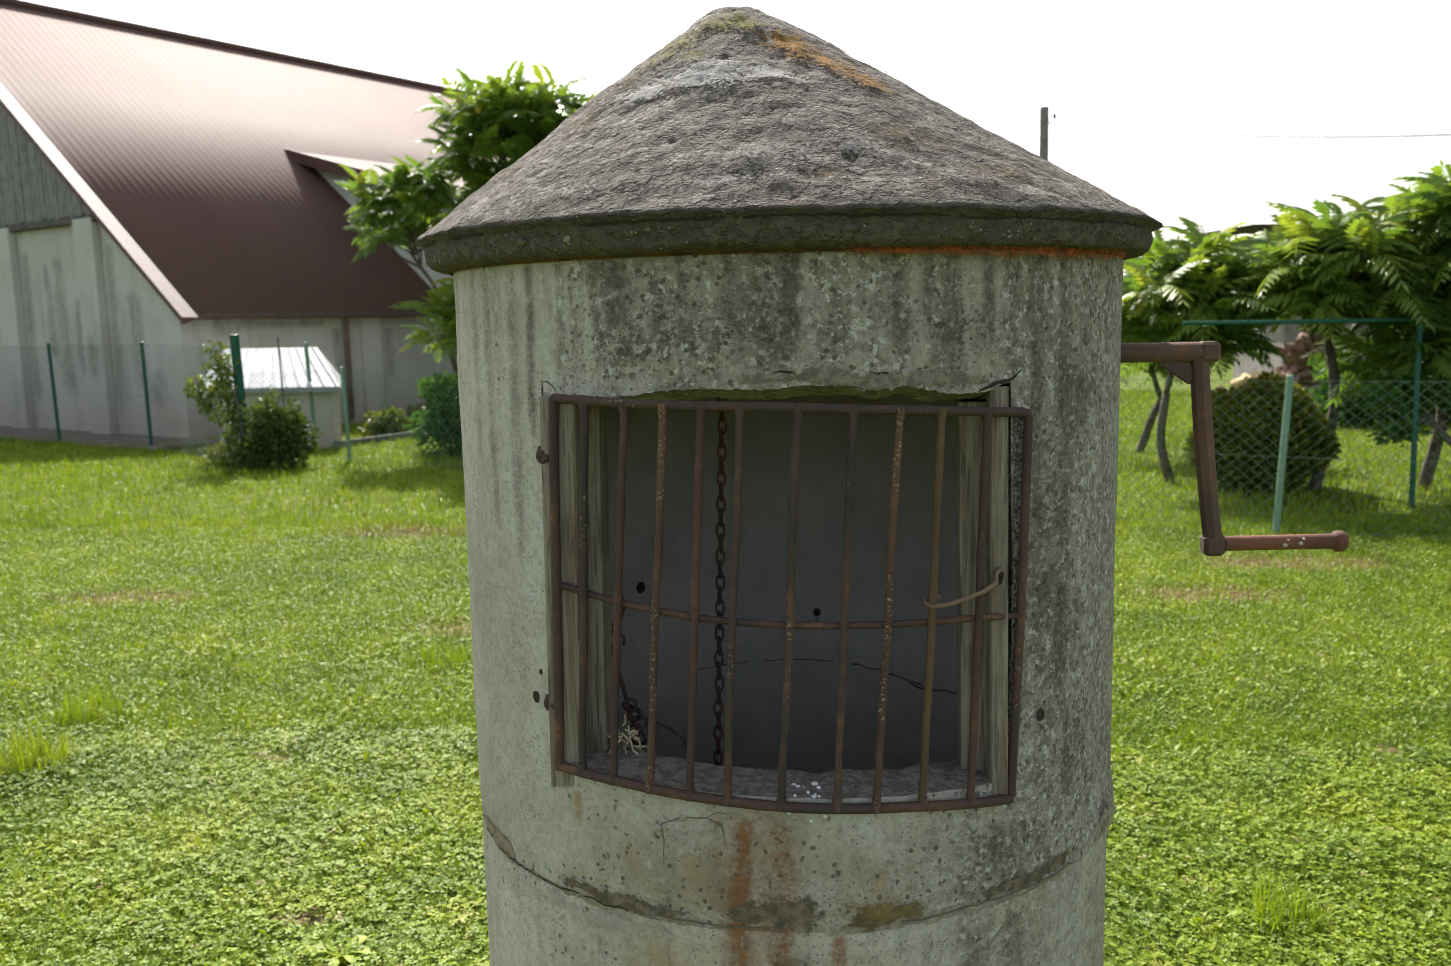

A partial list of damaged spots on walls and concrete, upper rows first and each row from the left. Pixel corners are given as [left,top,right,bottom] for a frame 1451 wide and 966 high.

rust [853,246,1126,259]